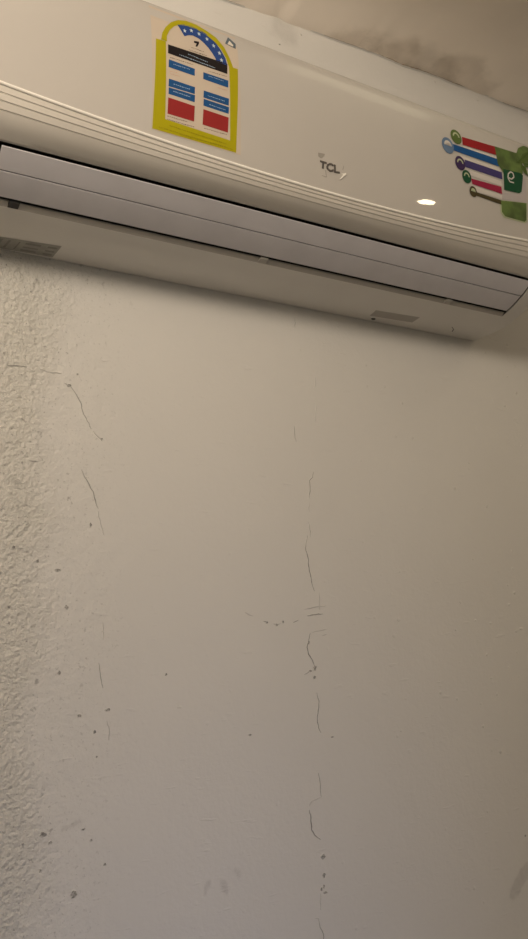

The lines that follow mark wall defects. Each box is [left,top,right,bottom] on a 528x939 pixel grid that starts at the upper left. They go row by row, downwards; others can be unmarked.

crack [81,470,104,535]
crack [245,473,327,733]
crack [309,773,328,939]